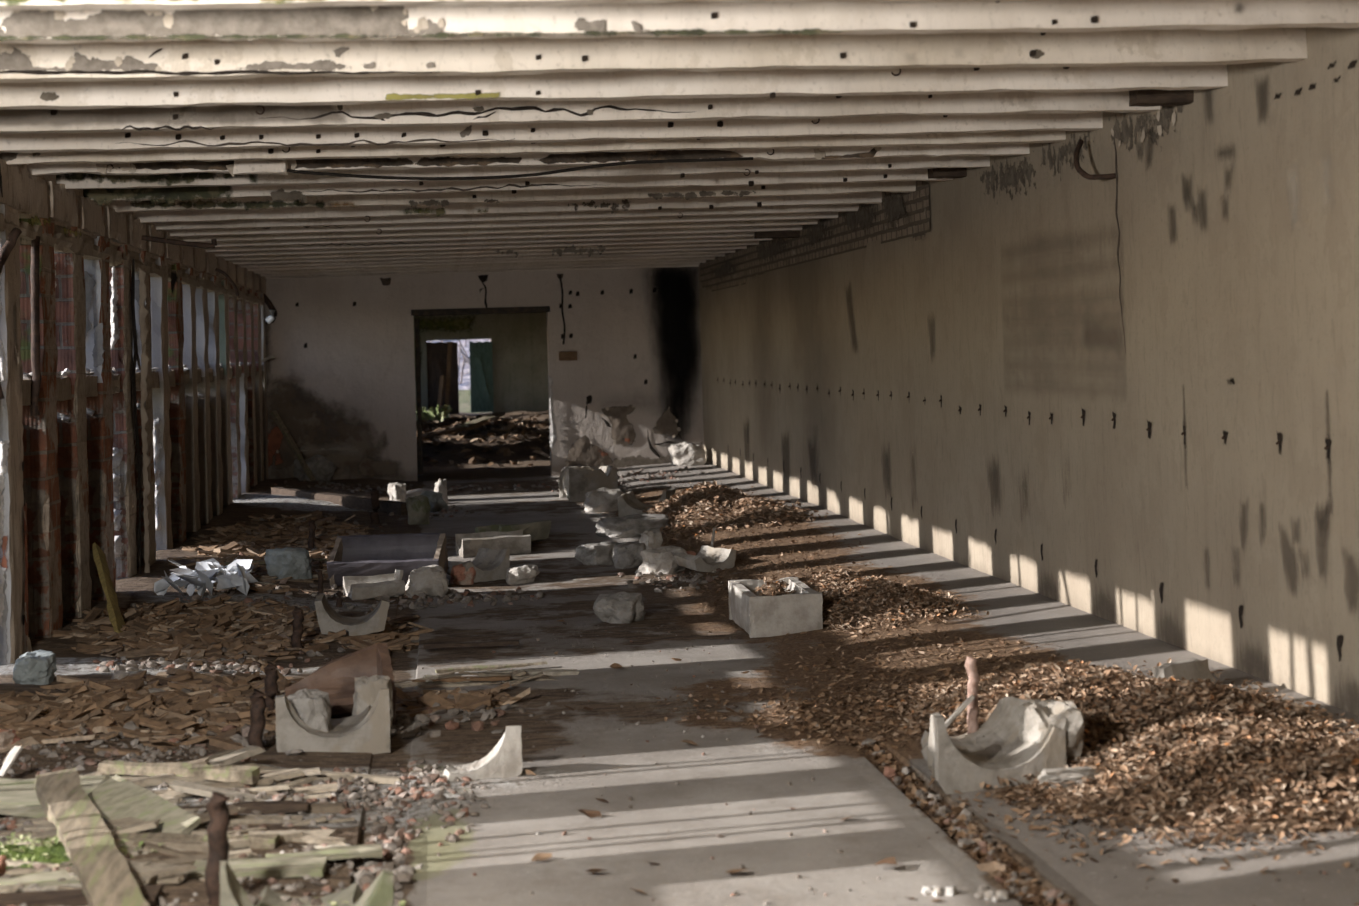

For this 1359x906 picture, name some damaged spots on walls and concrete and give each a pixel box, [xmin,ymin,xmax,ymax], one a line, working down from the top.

peeling [574,18,608,32]
peeling [0,6,444,71]
peeling [40,92,59,101]
peeling [0,152,40,161]
spalling [96,160,235,177]
spalling [287,156,522,170]
spalling [539,150,743,164]
spalling [548,376,681,468]
spalling [0,440,10,666]